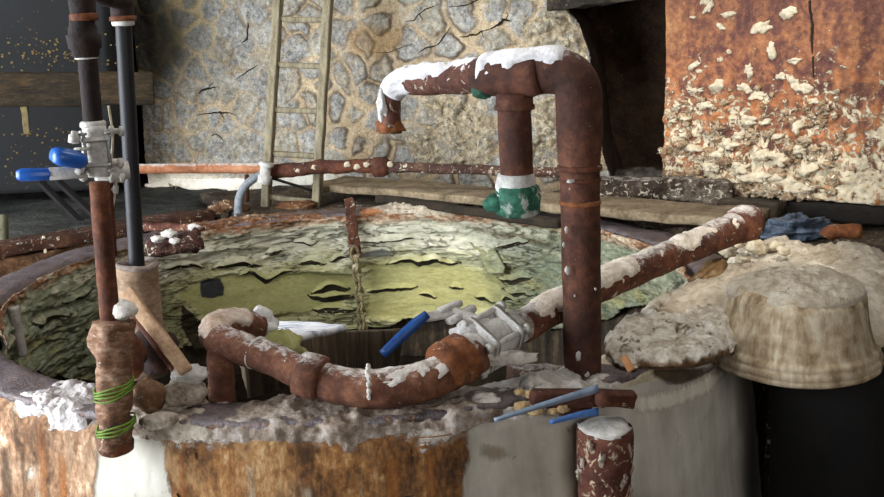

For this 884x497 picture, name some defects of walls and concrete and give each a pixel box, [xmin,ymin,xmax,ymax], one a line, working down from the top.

crack [405,0,478,22]
crack [375,14,511,53]
corrosion [656,0,884,206]
peeling [163,237,348,284]
peeling [360,233,424,243]
peeling [386,253,462,267]
peeling [470,236,538,303]
peeling [307,279,437,314]
spalling [180,305,204,350]
leakage [15,379,96,432]
corrosion [162,430,470,497]